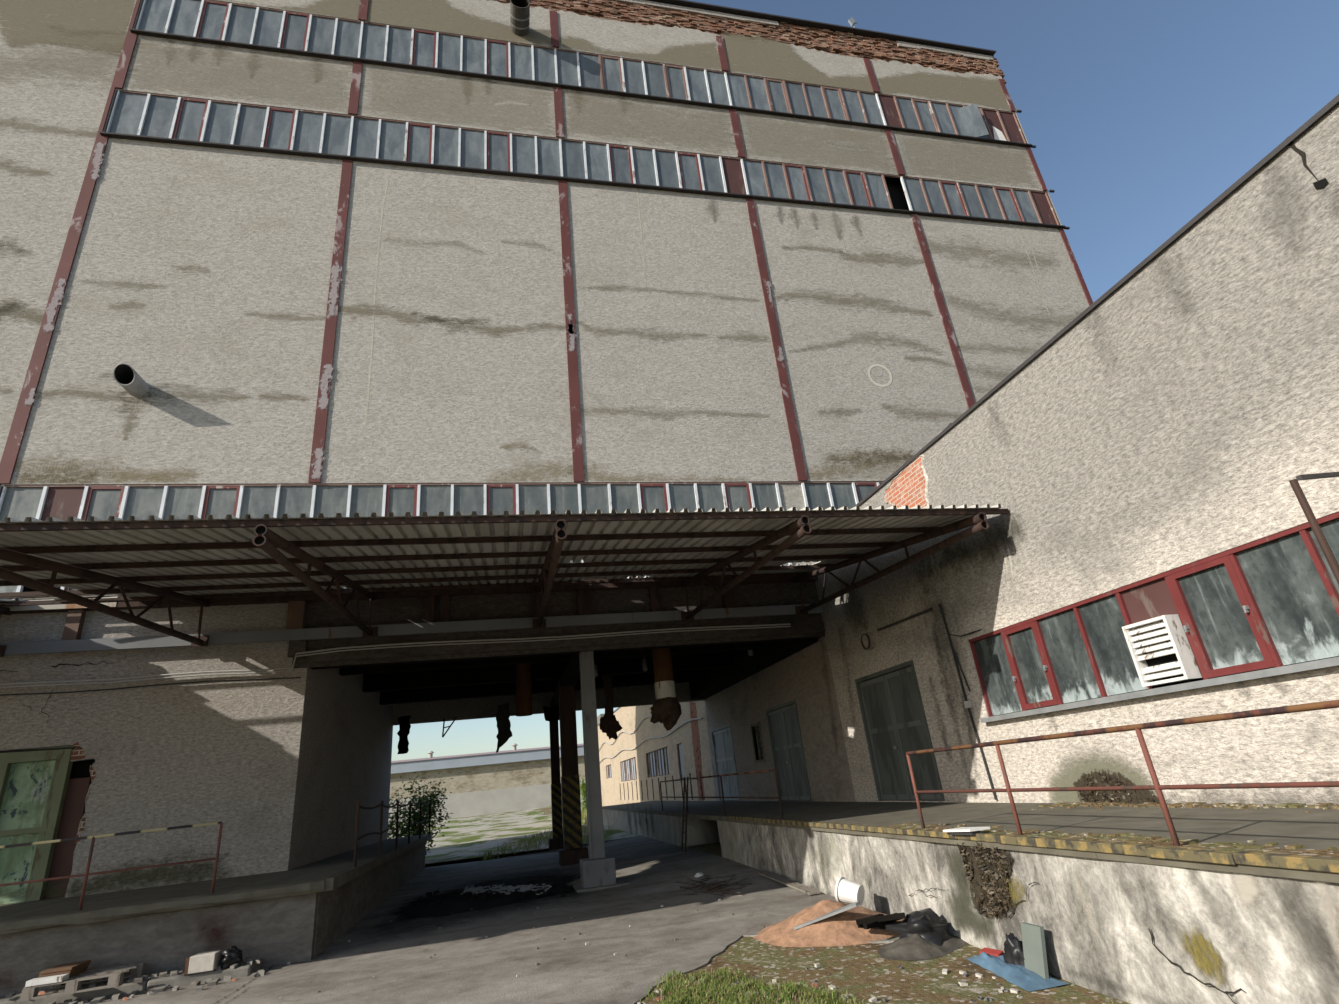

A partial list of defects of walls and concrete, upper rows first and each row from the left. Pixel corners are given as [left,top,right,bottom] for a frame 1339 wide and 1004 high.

water stain [0,0,134,56]
peeling [90,142,105,180]
water stain [783,246,924,265]
water stain [0,300,43,322]
peeling [43,278,66,333]
water stain [777,293,931,316]
crack [1149,929,1247,1004]